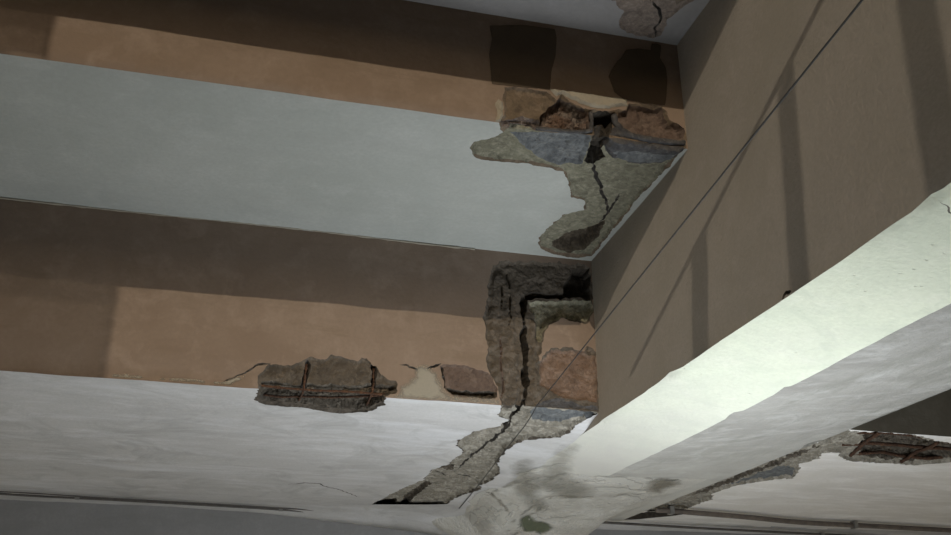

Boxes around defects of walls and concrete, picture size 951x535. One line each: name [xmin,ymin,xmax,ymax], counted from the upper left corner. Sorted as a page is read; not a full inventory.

flaking render [612,0,694,38]
spalling [373,87,687,505]
spalling [254,355,398,414]
spalling [624,430,951,520]